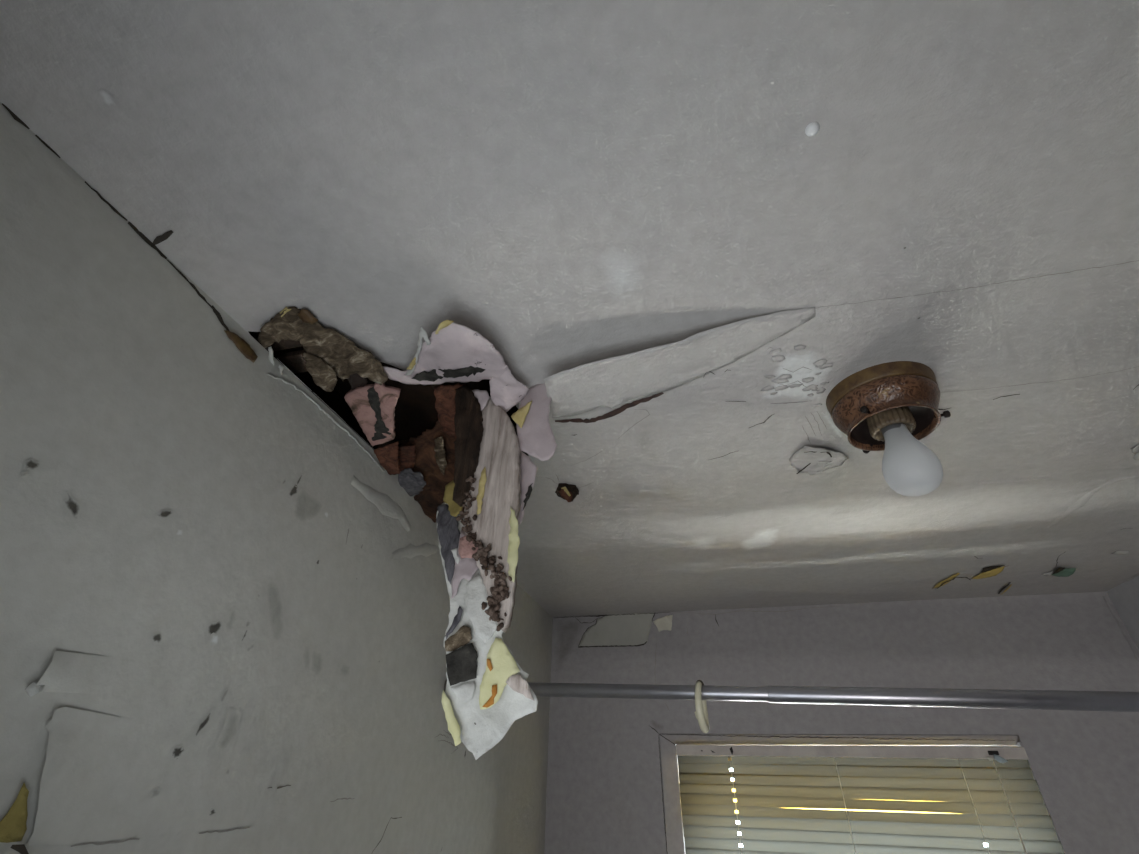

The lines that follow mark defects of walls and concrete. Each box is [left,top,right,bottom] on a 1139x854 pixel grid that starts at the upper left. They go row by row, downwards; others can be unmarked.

crack [2,103,229,331]
peeling [742,338,845,442]
peeling [511,383,579,525]
peeling [932,565,1012,594]
peeling [1043,567,1076,577]